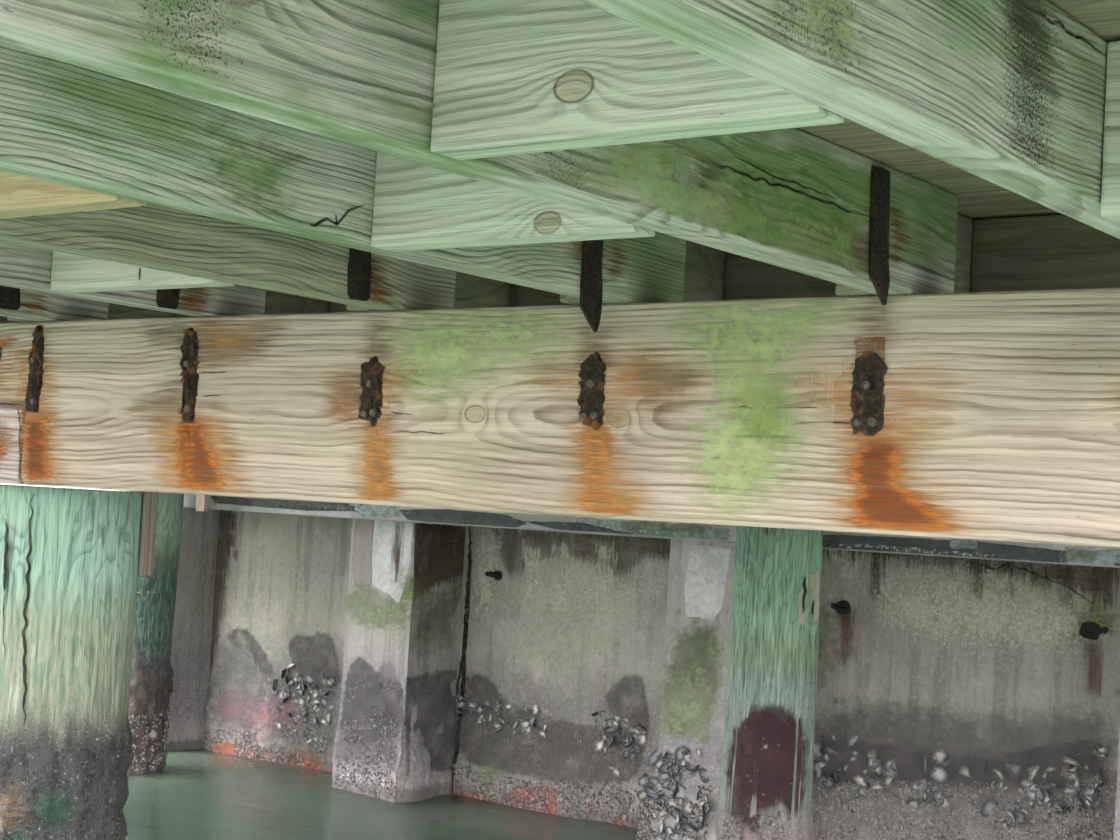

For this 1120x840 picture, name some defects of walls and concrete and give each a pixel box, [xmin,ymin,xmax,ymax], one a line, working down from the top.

water stain [127,0,243,80]
water stain [989,0,1061,167]
crack [298,205,363,227]
crack [663,140,897,226]
corrosion [0,337,60,480]
corrosion [128,382,240,493]
corrosion [330,376,398,500]
corrosion [573,427,643,514]
corrosion [786,298,962,531]
crack [0,402,34,725]
crack [451,526,472,793]
peeling [795,567,820,629]